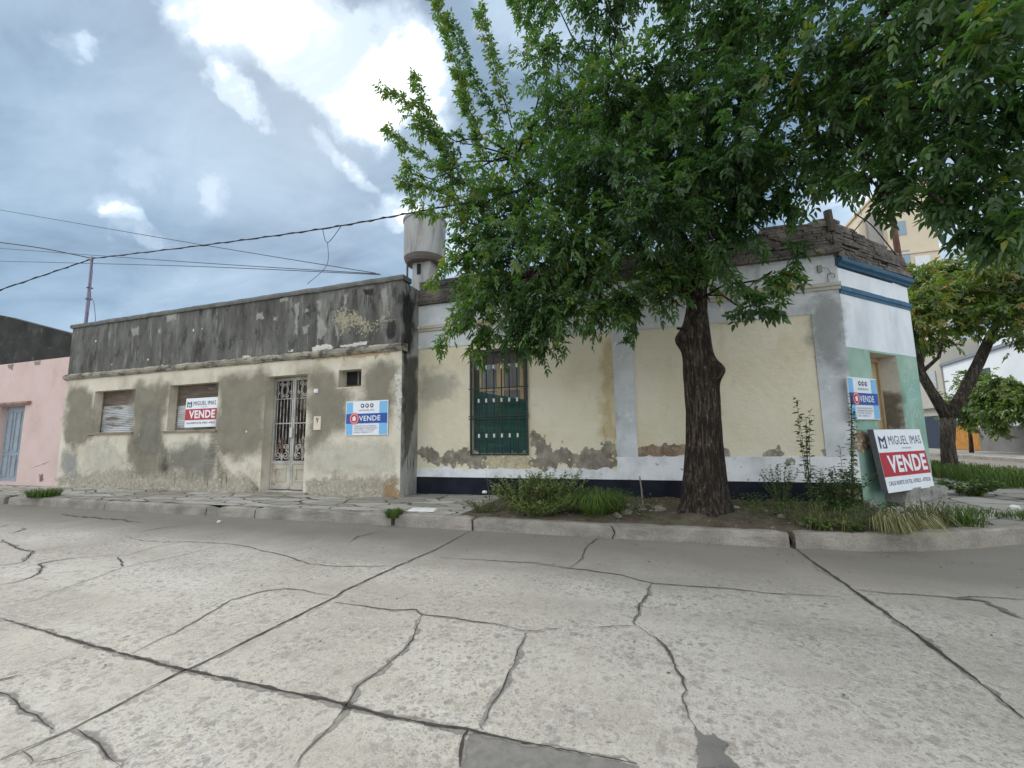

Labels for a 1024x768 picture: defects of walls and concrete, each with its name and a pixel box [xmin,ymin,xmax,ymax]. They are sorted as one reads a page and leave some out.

leakage [62,371,270,486]
leakage [295,287,418,474]
peeling [417,430,617,472]
peeling [638,443,685,457]
crack [0,513,1024,768]